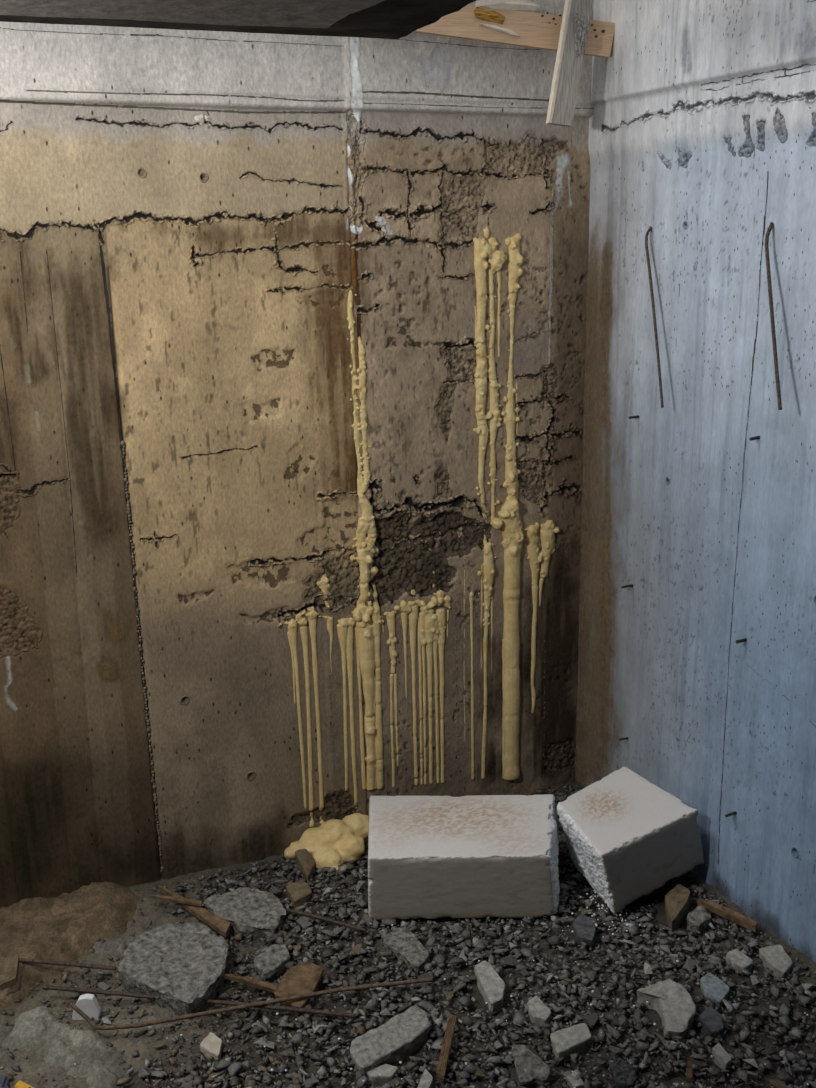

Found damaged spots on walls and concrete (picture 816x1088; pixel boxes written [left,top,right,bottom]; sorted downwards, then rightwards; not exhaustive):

crack [0,111,555,316]
leakage [57,281,110,535]
spalling [300,499,357,554]
spalling [0,586,43,658]
spalling [178,590,214,605]
spalling [231,561,294,588]
spalling [240,607,291,624]
leakage [6,656,17,710]